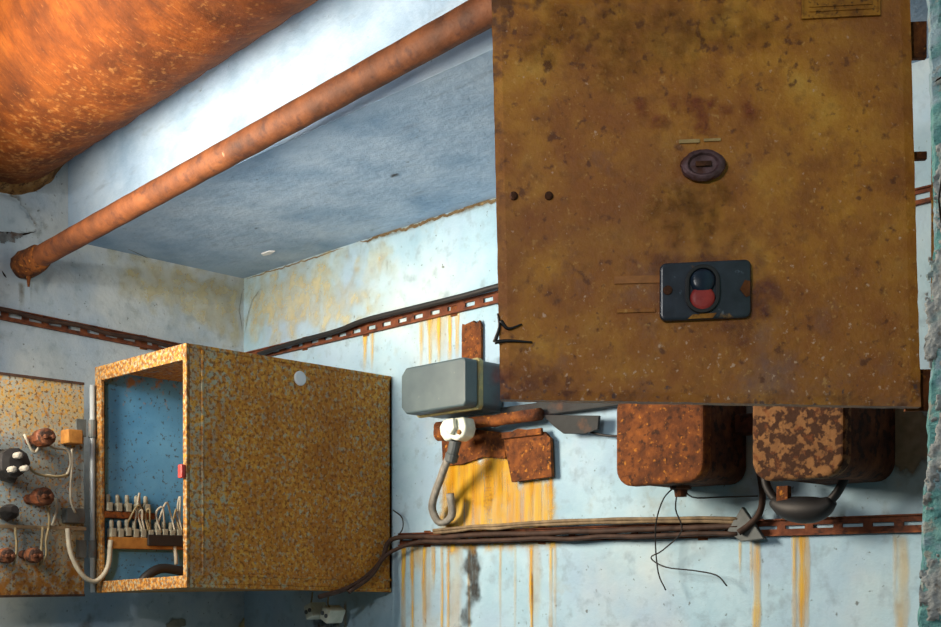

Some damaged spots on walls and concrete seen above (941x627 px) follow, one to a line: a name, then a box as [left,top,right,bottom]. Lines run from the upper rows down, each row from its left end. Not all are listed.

spalling [0,192,38,244]
peeling [923,143,941,368]
corrosion [402,458,552,621]
corrosion [793,536,804,624]
peeling [919,554,941,621]